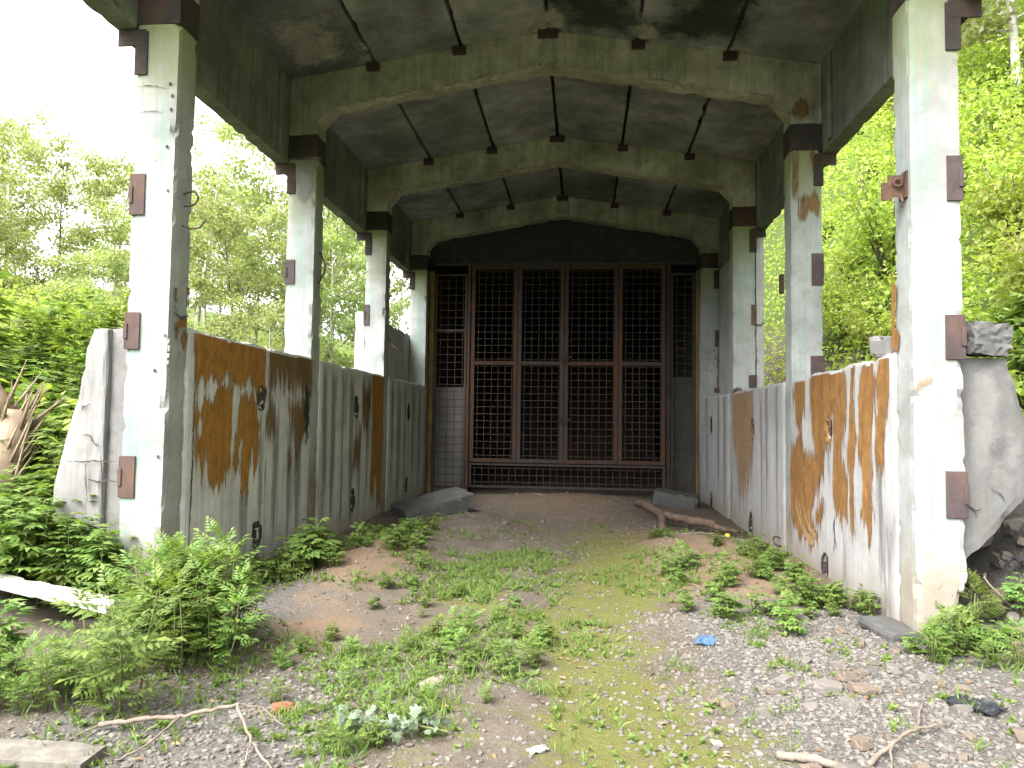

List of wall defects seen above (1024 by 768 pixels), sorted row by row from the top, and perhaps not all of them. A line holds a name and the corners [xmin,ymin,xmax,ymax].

efflorescence [532,8,565,32]
rust [792,99,814,118]
rust [791,149,820,220]
rust [193,333,313,497]
rust [352,375,384,511]
rust [732,391,753,500]
rust [790,272,901,559]